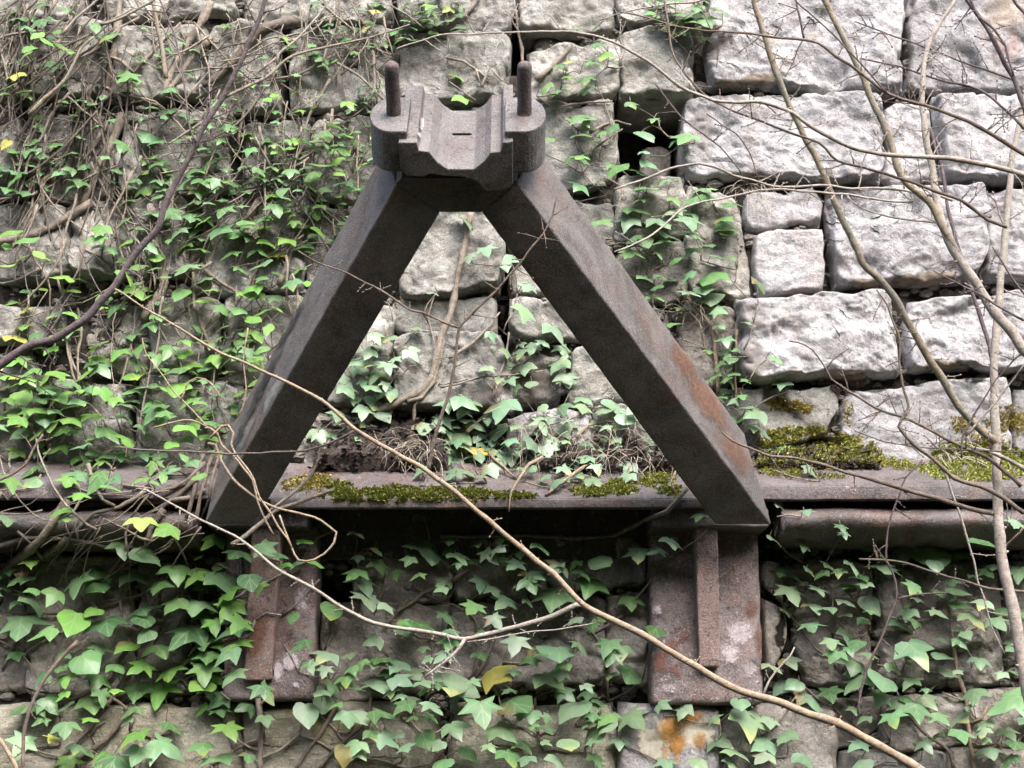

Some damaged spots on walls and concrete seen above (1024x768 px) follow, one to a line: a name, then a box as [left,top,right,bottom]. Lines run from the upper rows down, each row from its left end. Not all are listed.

corrosion [674,342,722,422]
corrosion [659,713,705,760]